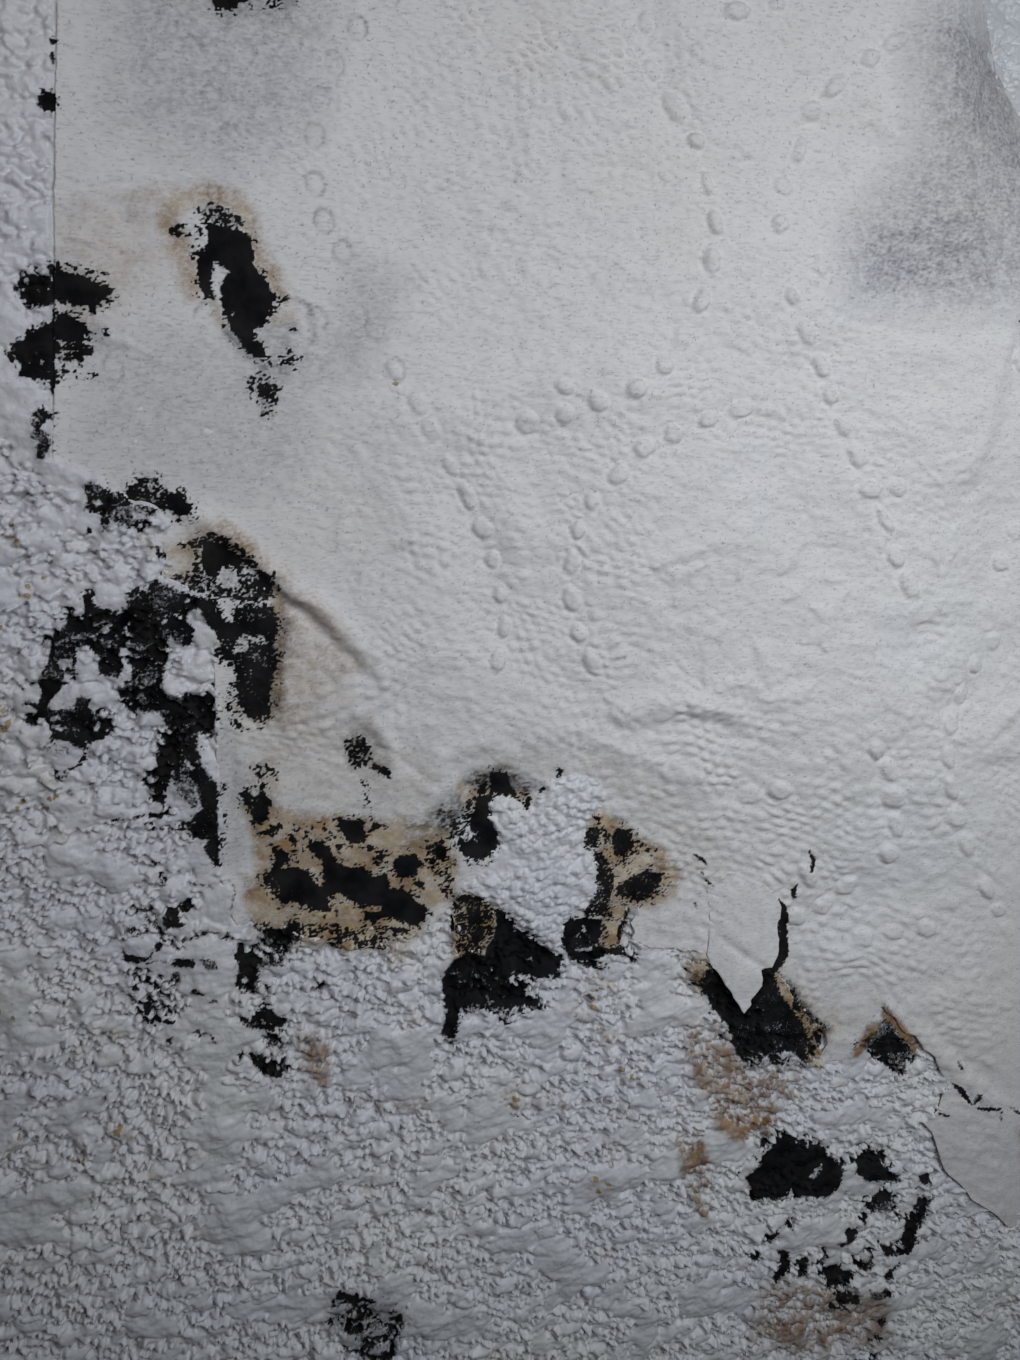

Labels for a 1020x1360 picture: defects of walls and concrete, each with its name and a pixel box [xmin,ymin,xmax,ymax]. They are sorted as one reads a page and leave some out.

mould [208,0,298,17]
mould [4,260,119,459]
mould [162,188,304,420]
damp [21,473,563,1084]
mould [561,812,677,970]
damp [677,1139,709,1217]
damp [682,959,933,1360]
mould [325,1290,404,1360]